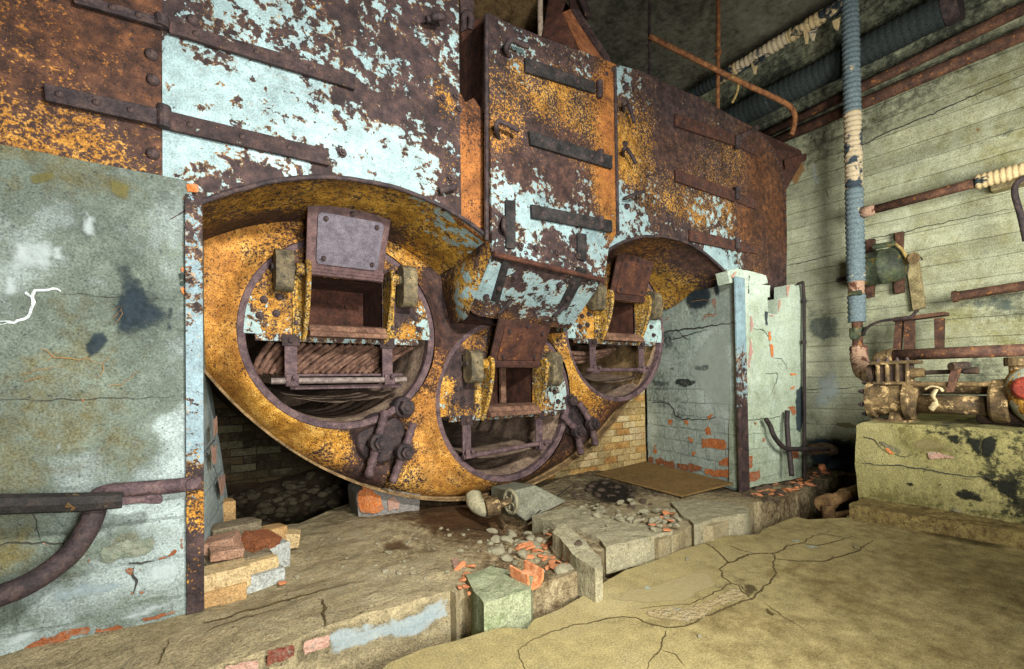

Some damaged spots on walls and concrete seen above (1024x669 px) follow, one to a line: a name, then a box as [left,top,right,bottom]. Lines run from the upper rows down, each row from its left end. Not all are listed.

water stain [118,267,172,332]
water stain [87,333,108,355]
crack [651,401,716,421]
spalling [648,414,729,478]
crack [863,437,1024,479]
water stain [937,432,997,457]
water stain [956,489,1005,517]
water stain [984,478,1020,504]
crack [518,531,873,669]